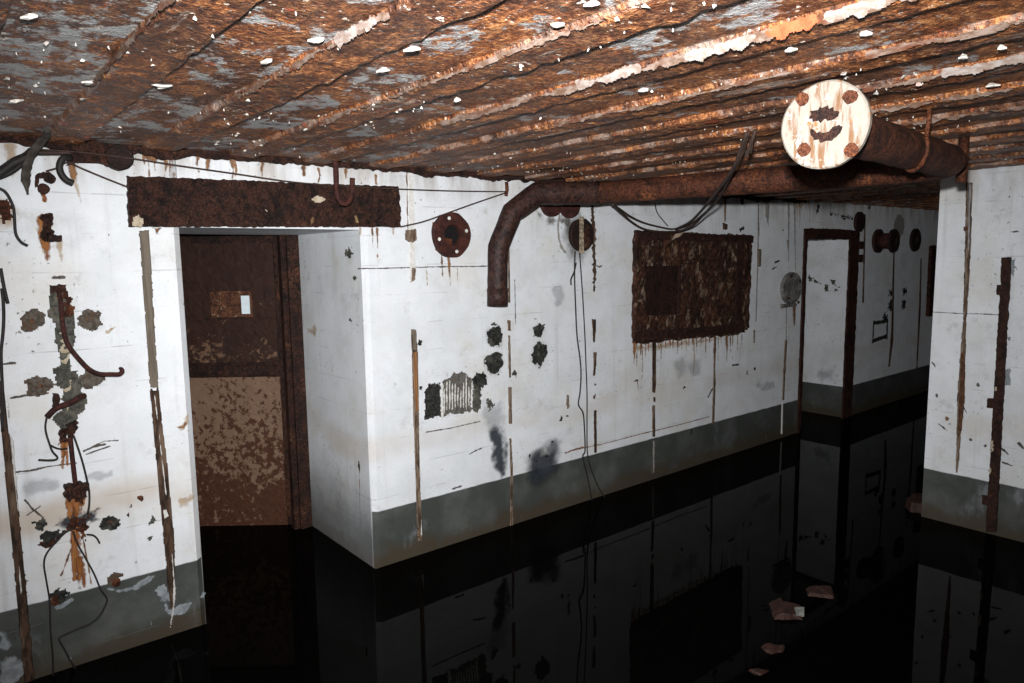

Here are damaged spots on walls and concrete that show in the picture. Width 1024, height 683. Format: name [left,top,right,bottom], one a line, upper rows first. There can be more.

corrosion [0,134,566,185]
corrosion [718,194,807,205]
corrosion [37,215,62,260]
spalling [20,275,115,429]
peeling [419,322,517,420]
peeling [531,318,548,369]
peeling [83,440,119,455]
spalling [31,495,144,548]